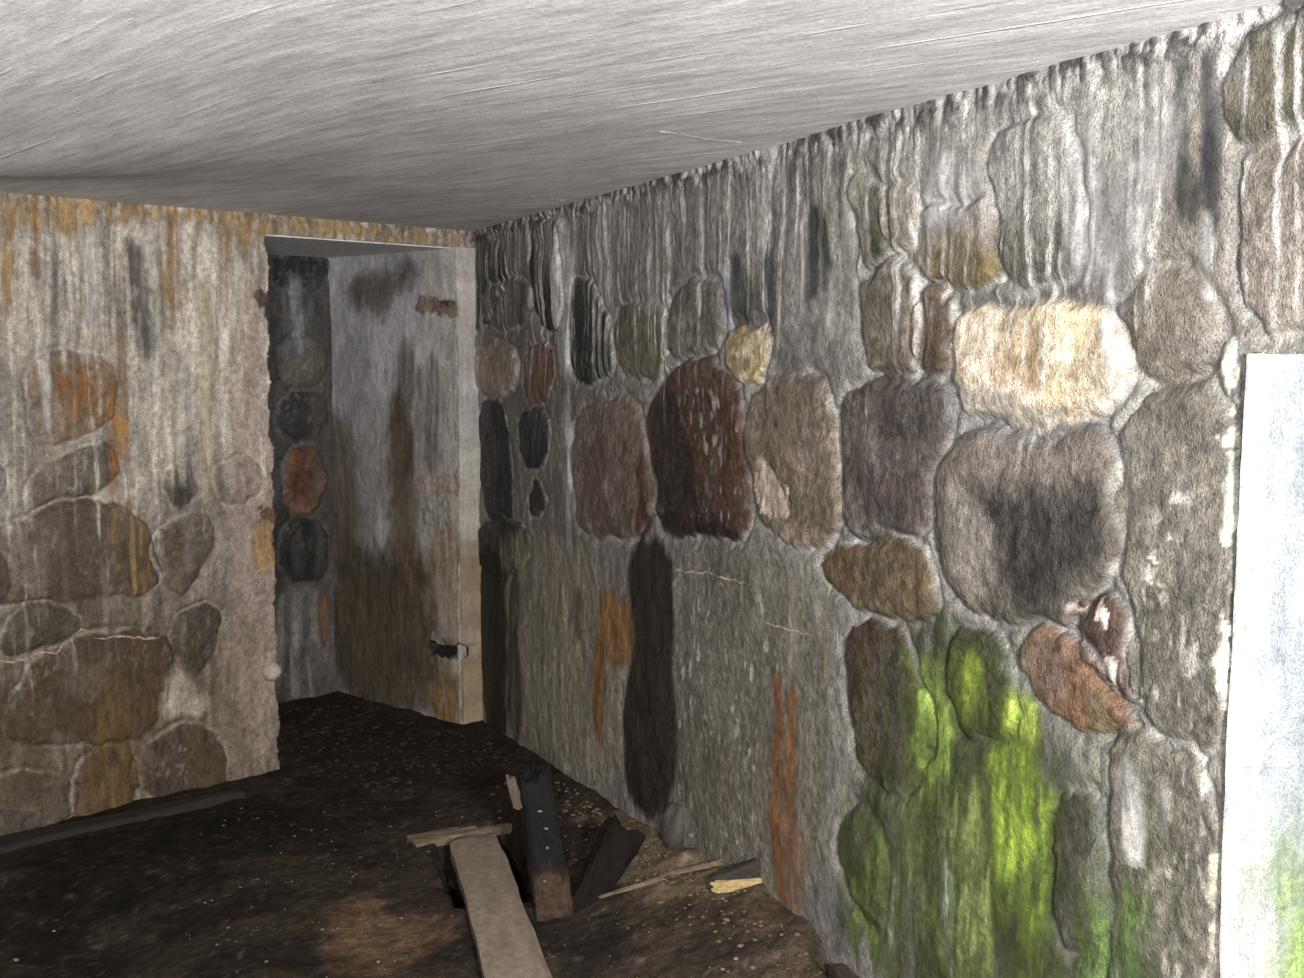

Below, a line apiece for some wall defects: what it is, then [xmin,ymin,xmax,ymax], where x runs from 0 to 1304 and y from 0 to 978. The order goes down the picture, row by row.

rust [1,196,393,313]
water stain [349,261,414,313]
water stain [332,347,439,710]
rust [593,589,631,750]
rust [772,676,801,915]
water stain [1120,760,1144,867]